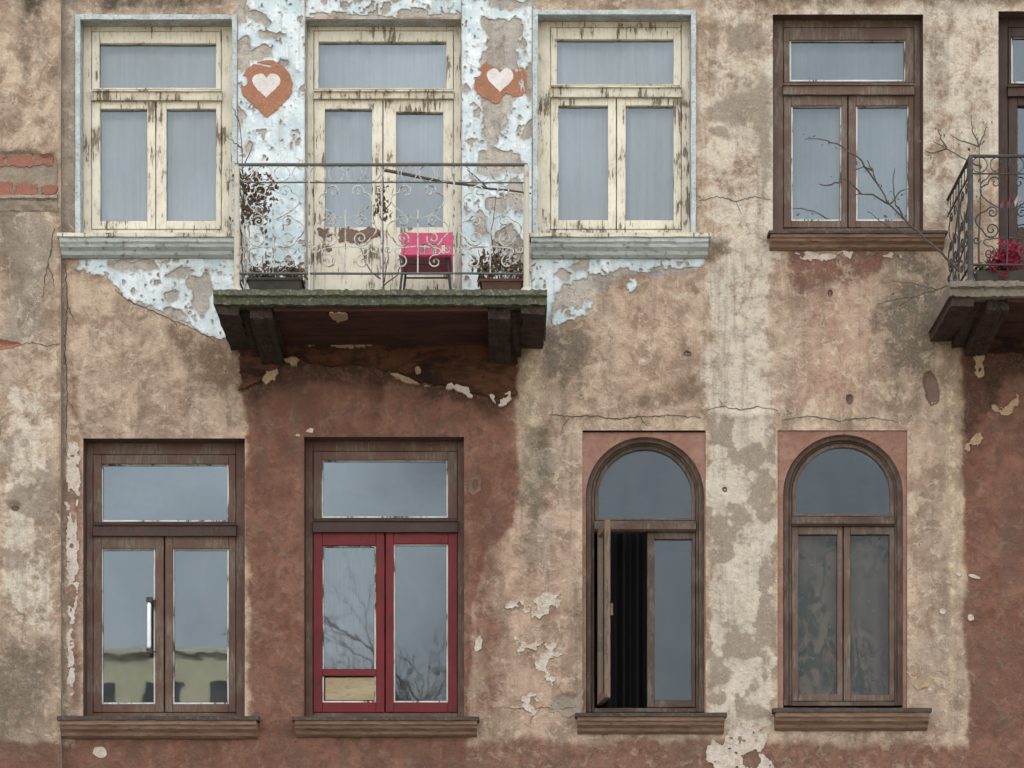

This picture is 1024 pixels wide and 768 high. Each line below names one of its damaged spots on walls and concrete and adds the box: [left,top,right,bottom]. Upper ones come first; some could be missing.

peeling [76,0,705,339]
crack [699,195,770,213]
crack [20,228,74,456]
spalling [262,356,300,385]
spalling [446,383,473,399]
spalling [490,391,511,408]
crack [550,398,899,435]
peeling [707,418,776,563]
peeling [64,441,81,696]
spalling [505,591,561,619]
spalling [514,636,584,718]
peeling [706,558,776,768]